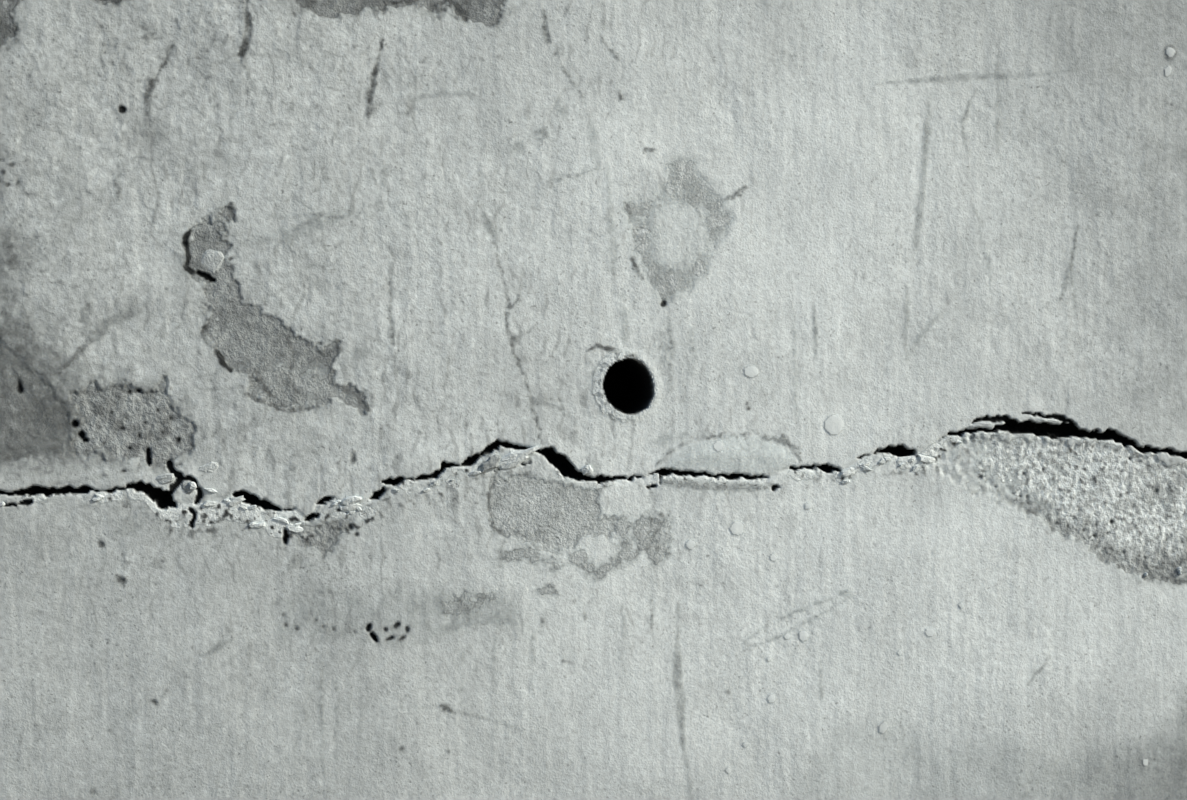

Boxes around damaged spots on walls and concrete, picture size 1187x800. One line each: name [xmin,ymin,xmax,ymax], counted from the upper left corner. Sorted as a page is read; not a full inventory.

flaking render [0,0,19,46]
flaking render [295,0,505,27]
peeling [181,203,370,416]
crack [0,296,1187,542]
spalling [973,435,1187,585]